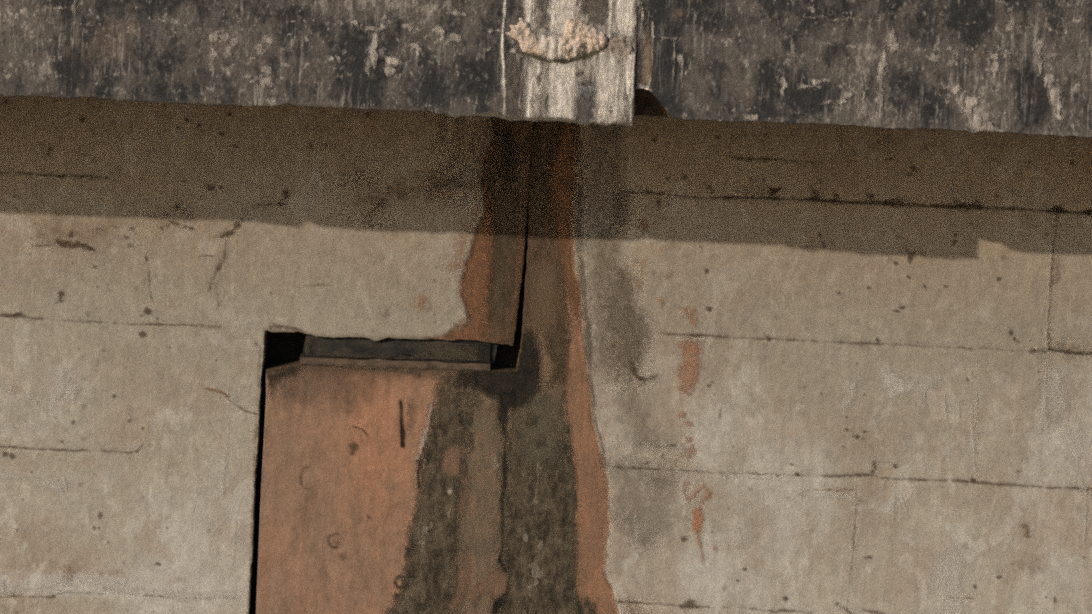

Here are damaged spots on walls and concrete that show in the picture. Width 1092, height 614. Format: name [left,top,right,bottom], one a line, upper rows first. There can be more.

spalling [255,331,306,371]
peeling [445,118,531,367]
leakage [337,0,683,614]
peeling [548,123,617,614]